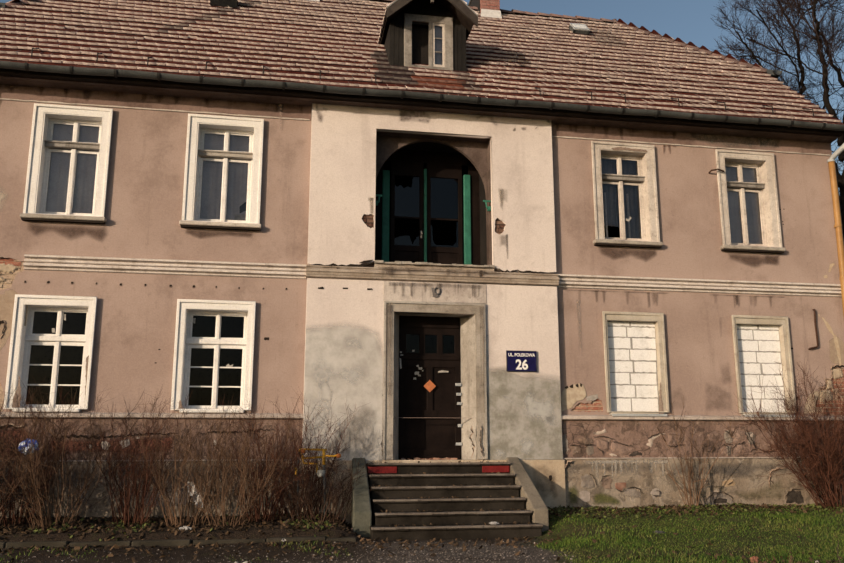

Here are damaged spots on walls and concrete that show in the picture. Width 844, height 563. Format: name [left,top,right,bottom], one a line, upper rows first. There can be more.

flaking render [362,215,374,228]
flaking render [495,218,506,234]
peeling [0,258,24,350]
flaking render [804,314,844,416]
peeling [0,377,21,412]
peeling [561,383,603,412]
peeling [627,432,665,456]
flaking render [600,475,661,500]
flaking render [786,489,804,504]